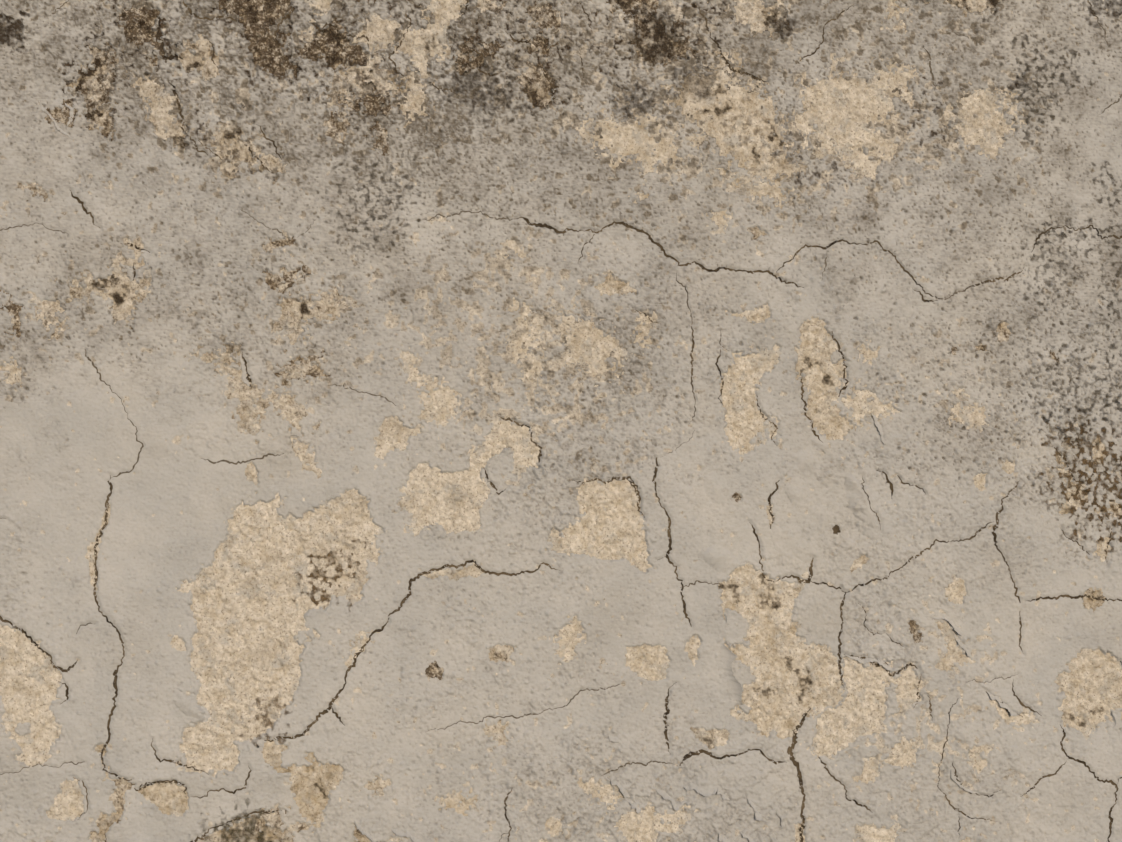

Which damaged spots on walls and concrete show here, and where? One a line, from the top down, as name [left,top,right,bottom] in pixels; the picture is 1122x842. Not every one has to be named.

mould [0,11,29,50]
damp [195,2,328,104]
mould [438,0,736,124]
damp [1003,33,1079,144]
crack [414,211,1122,627]
peeling [0,625,62,768]
crack [0,349,284,842]
peeling [46,461,384,842]
peeling [545,475,657,574]
crack [602,682,873,842]
peeling [690,564,976,761]
crack [750,480,1122,842]